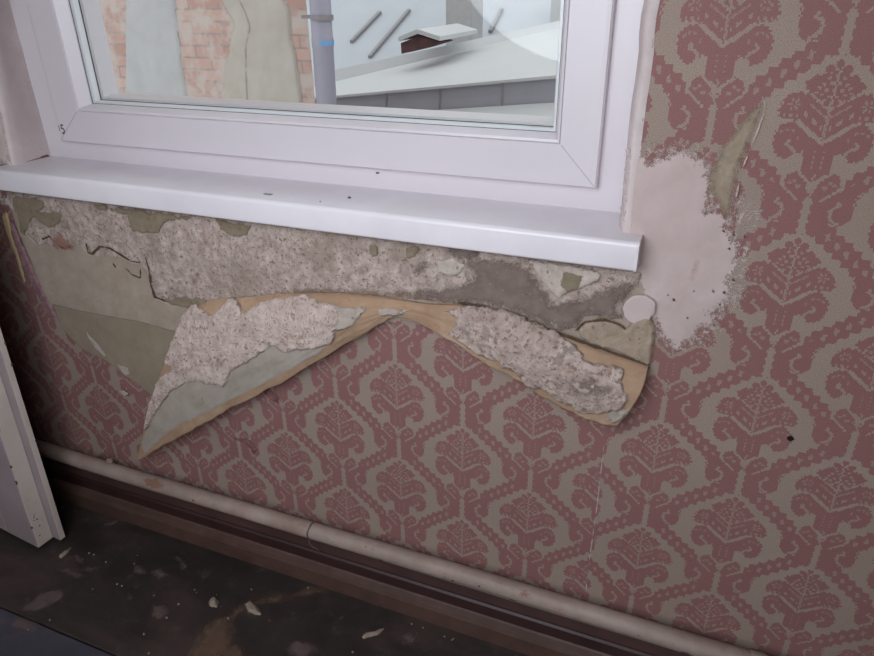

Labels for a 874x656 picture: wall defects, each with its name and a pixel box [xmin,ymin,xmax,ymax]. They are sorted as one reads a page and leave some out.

crack [42,235,166,302]
flaking render [6,191,658,395]
crack [458,302,497,310]
crack [526,318,649,369]